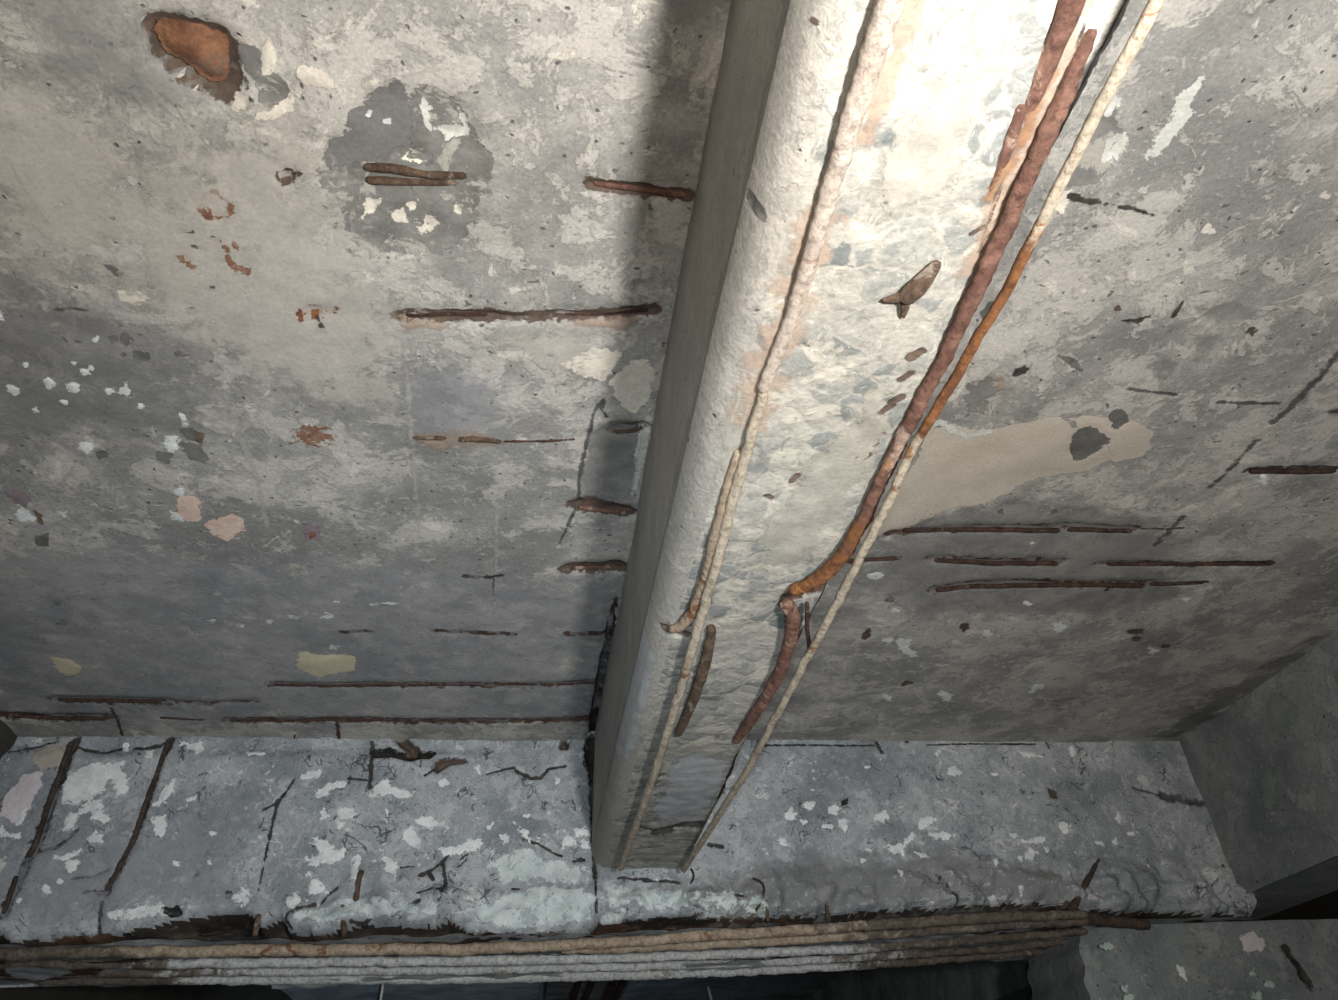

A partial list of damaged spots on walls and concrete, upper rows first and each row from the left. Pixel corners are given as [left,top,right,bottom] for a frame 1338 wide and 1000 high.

corrosion [984,69,1058,202]
crack [1051,0,1130,148]
spalling [57,332,150,364]
flaking render [615,0,1206,876]
crack [1127,387,1178,396]
crack [1208,351,1338,488]
crack [798,515,1275,639]
spalling [0,597,1151,1000]